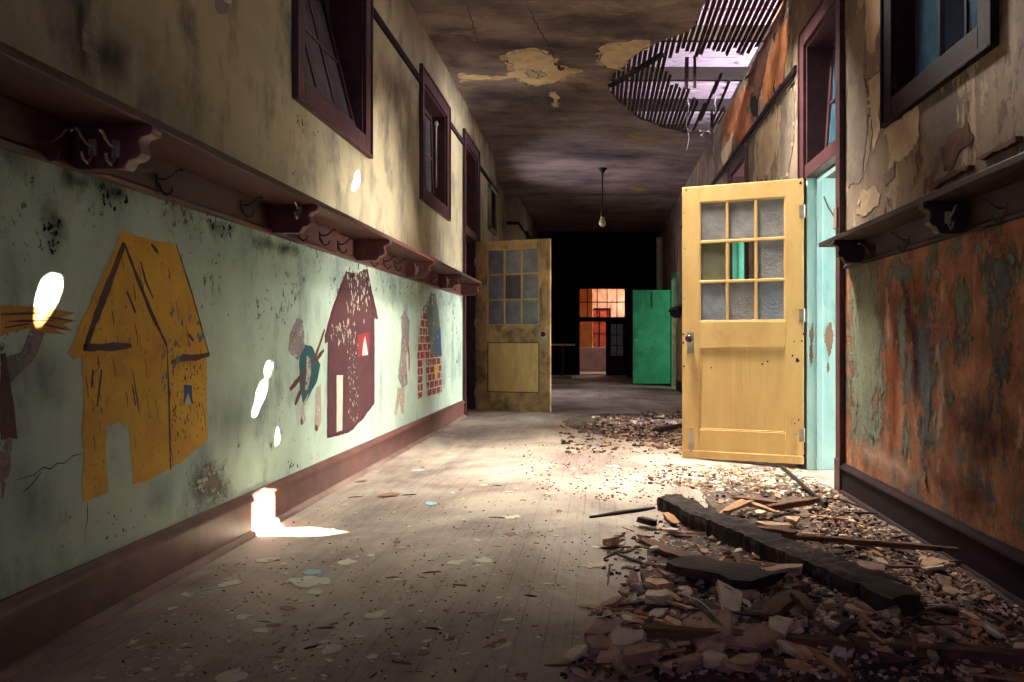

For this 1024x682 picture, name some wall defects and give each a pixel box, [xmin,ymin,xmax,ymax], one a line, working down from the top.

peeling [458,48,584,107]
peeling [595,40,651,71]
peeling [721,0,802,184]
peeling [844,0,920,217]
flaking render [925,122,1024,189]
peeling [792,236,1020,482]
crack [15,454,81,492]